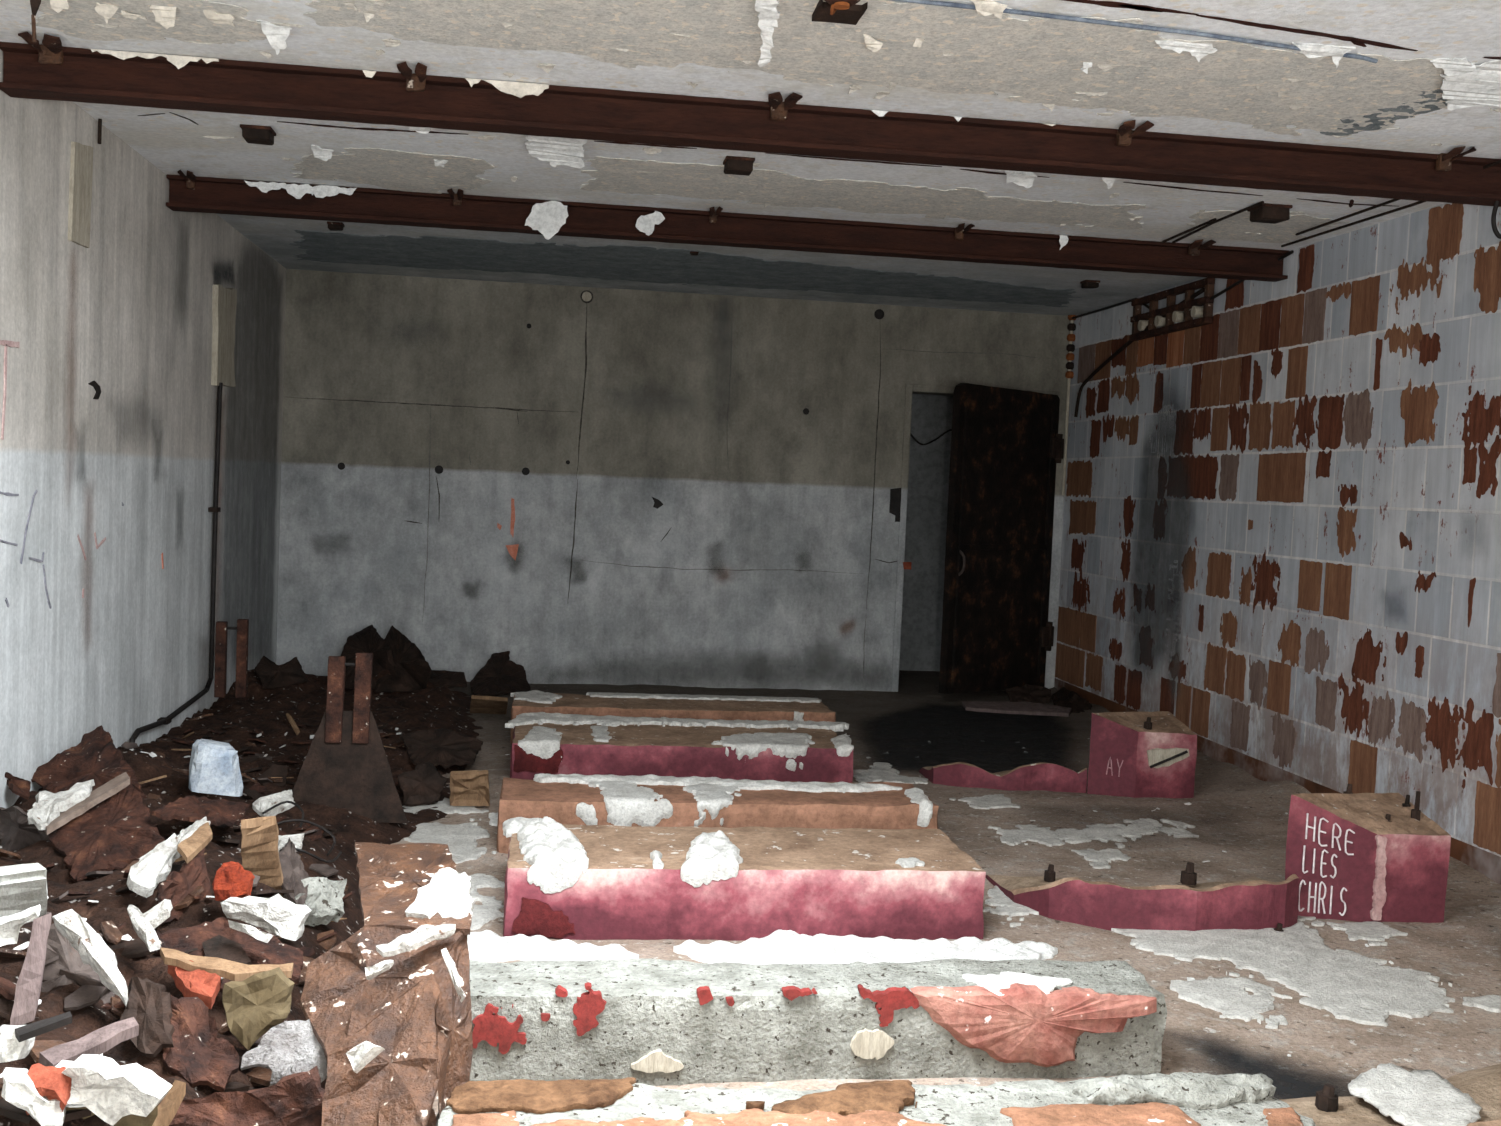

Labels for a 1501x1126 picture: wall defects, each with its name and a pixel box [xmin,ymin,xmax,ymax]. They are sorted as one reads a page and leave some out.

crack [1062,0,1418,51]
spalling [30,0,1501,138]
peeling [1055,203,1501,855]
spalling [631,1049,684,1073]
spalling [850,1028,894,1060]